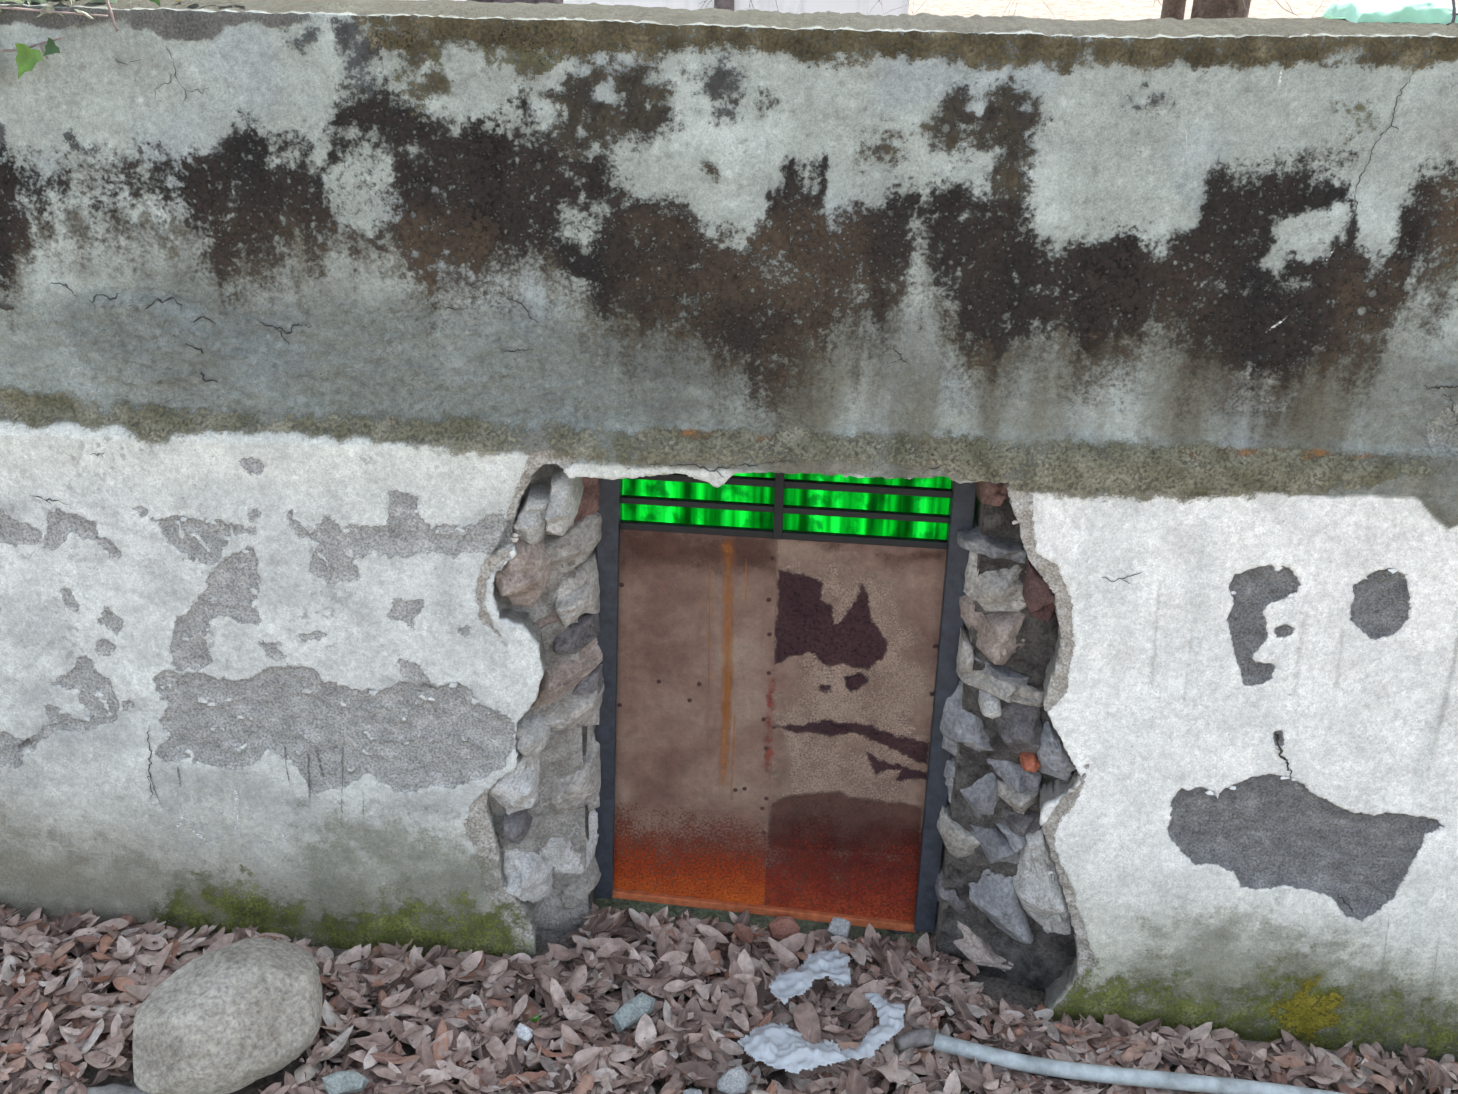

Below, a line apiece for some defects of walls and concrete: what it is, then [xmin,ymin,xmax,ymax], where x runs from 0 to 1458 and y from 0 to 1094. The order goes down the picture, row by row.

damp [0,5,1458,446]
crack [1340,73,1413,283]
crack [1423,385,1458,424]
peeling [287,446,578,638]
peeling [775,570,888,693]
spalling [1008,485,1076,712]
spalling [1227,565,1301,686]
spalling [1350,568,1411,640]
peeling [133,506,533,939]
corrosion [613,803,922,922]
spalling [1167,774,1444,922]
damp [1133,915,1458,1056]